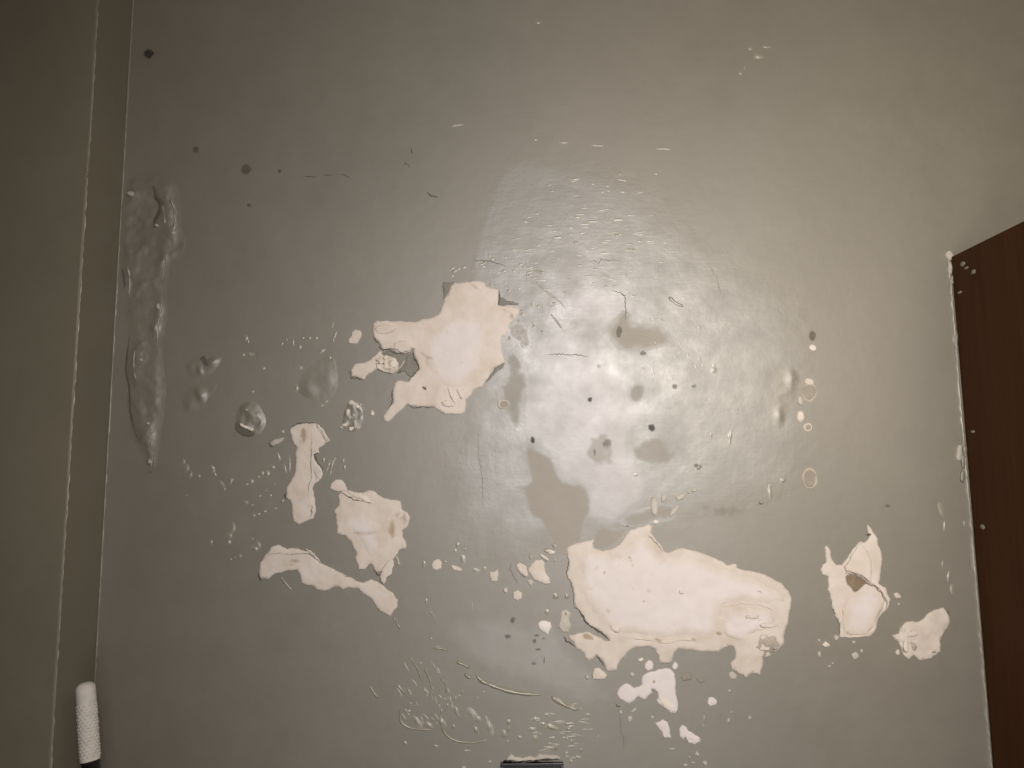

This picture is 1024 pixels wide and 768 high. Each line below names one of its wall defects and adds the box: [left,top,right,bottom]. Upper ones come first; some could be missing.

peeling [340,281,526,432]
water stain [443,157,815,563]
peeling [258,422,410,616]
peeling [489,488,792,767]
peeling [817,525,901,668]
peeling [892,608,950,661]